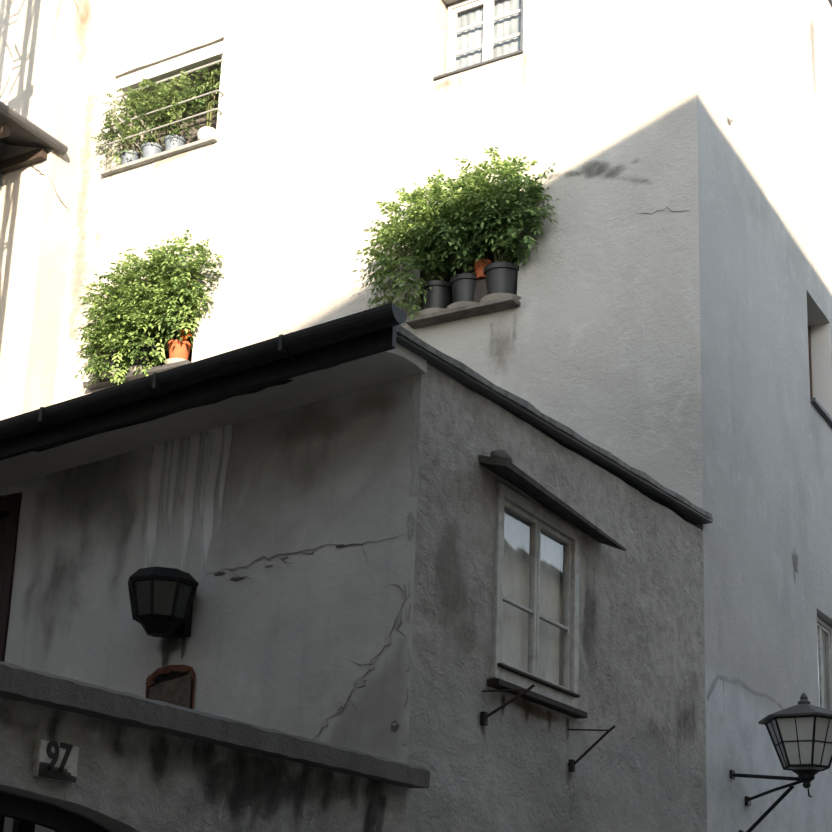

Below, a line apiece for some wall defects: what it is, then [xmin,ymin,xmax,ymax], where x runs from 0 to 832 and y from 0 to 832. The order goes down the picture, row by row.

crack [204,536,398,581]
crack [313,584,410,739]
leakage [193,745,310,832]
leakage [366,779,386,832]